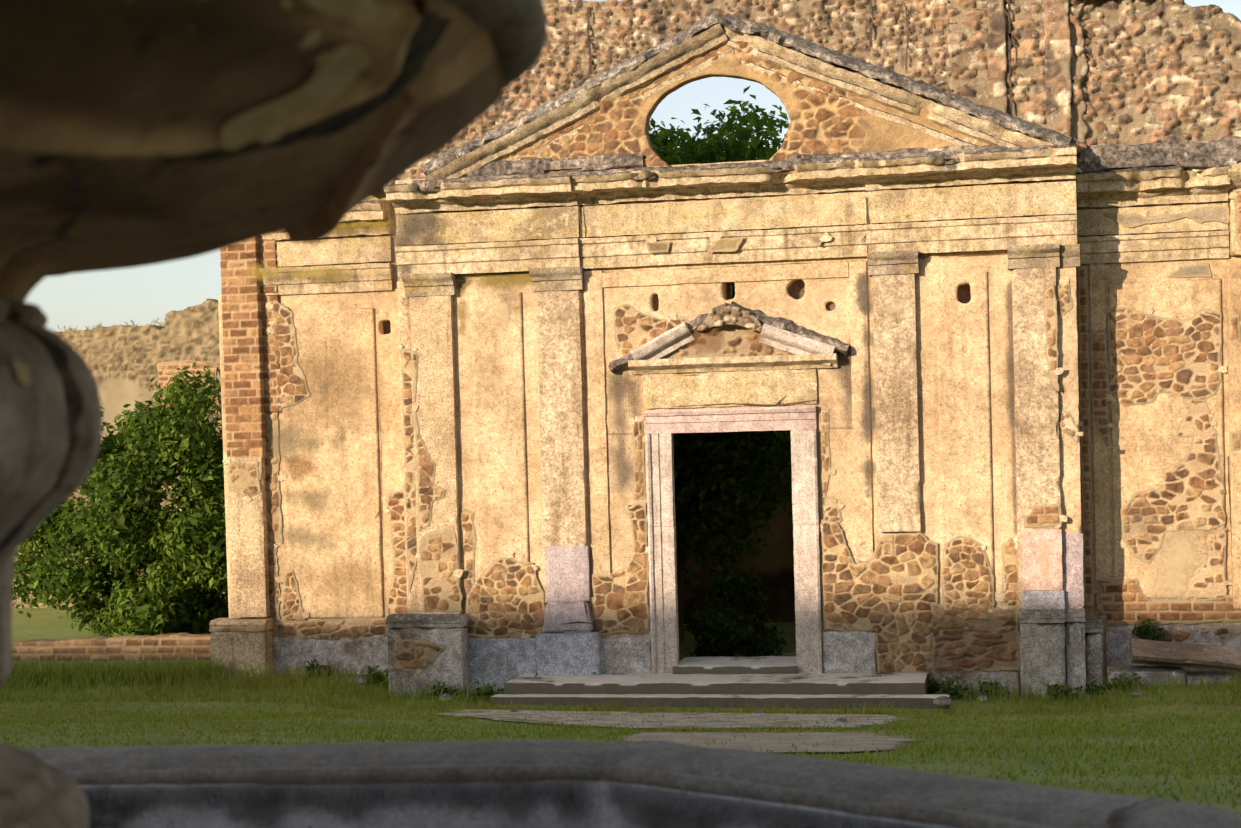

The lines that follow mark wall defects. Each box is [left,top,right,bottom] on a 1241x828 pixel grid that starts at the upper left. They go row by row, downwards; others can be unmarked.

peeling [303,0,389,27]
peeling [221,30,372,151]
flaking render [1228,188,1241,247]
damp [857,274,870,314]
flaking render [613,304,690,360]
damp [835,350,850,390]
damp [863,374,874,437]
flaking render [1040,266,1241,643]
flaking render [223,300,545,674]
flaking render [589,416,650,635]
flaking render [818,409,1020,673]
flaking render [1021,504,1067,529]